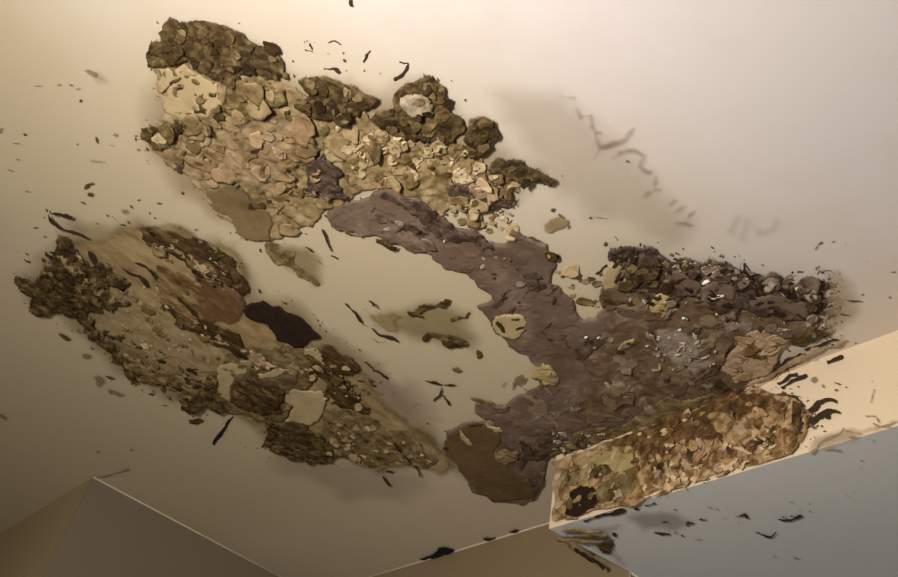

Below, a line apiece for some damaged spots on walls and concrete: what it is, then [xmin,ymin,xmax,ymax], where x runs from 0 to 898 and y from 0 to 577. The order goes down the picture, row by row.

peeling [140,17,555,286]
flaking render [14,189,850,522]
peeling [557,527,617,570]
peeling [809,428,858,454]